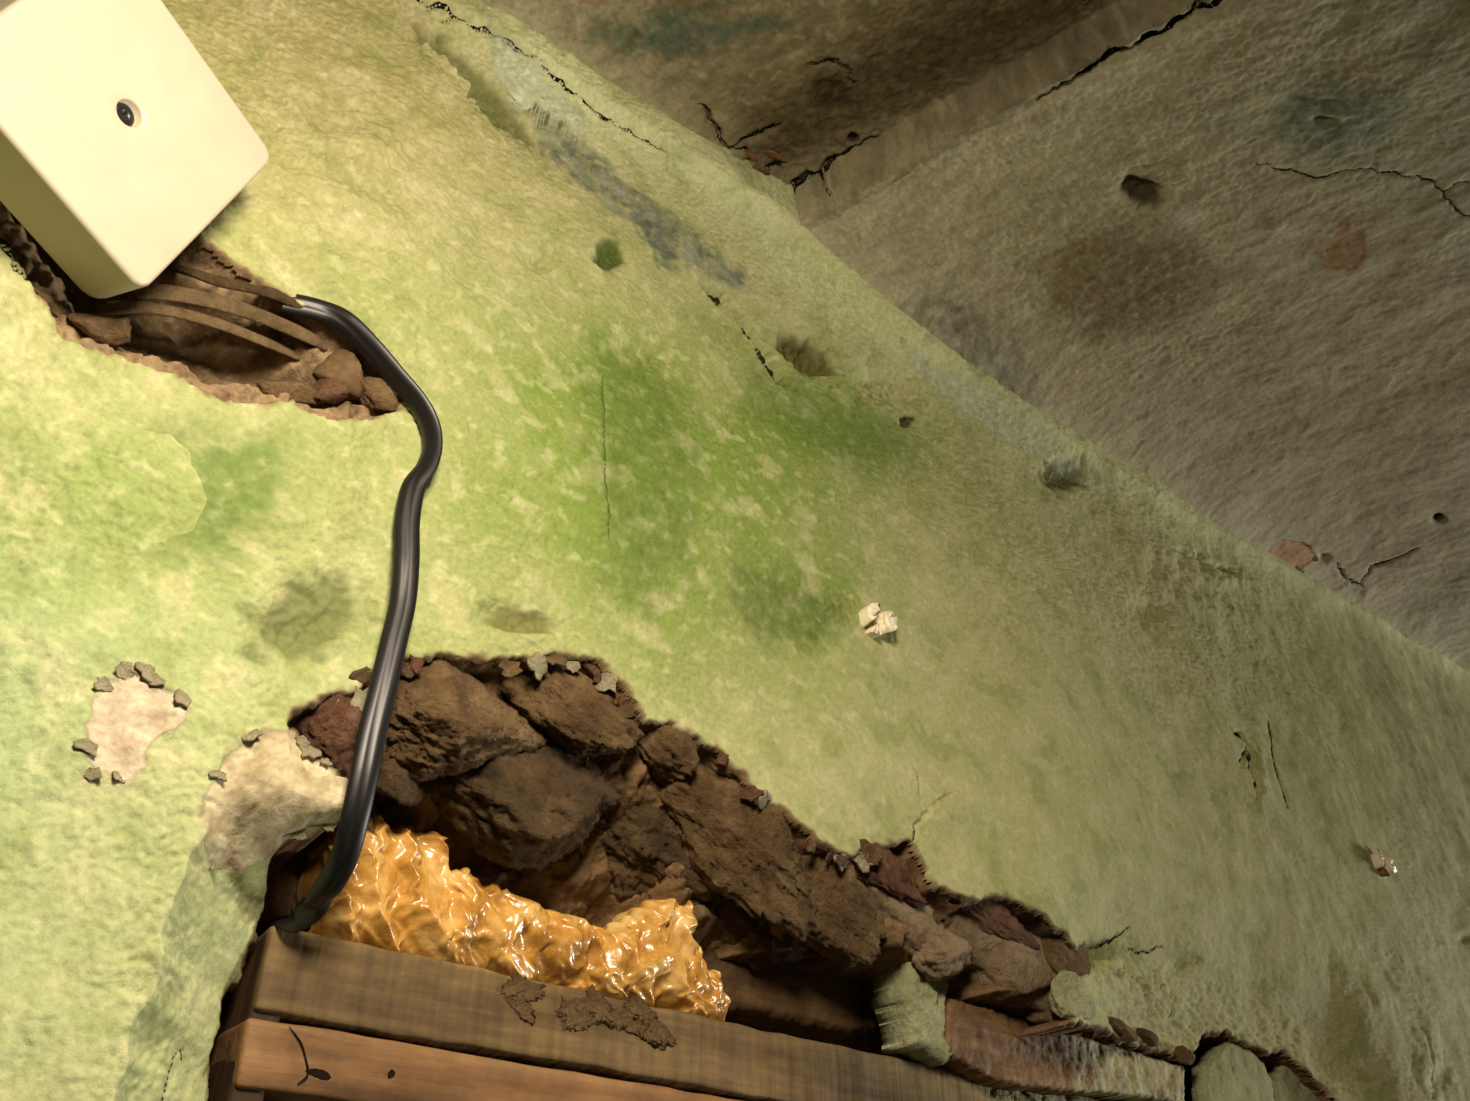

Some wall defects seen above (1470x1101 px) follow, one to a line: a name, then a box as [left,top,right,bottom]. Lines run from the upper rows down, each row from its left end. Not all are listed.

crack [811,58,856,85]
crack [1058,0,1222,86]
crack [704,105,868,201]
crack [1257,163,1470,217]
flaking render [0,201,401,421]
crack [1336,548,1415,585]
flaking render [73,661,192,786]
flaking render [199,666,372,937]
flaking render [367,652,1334,1101]